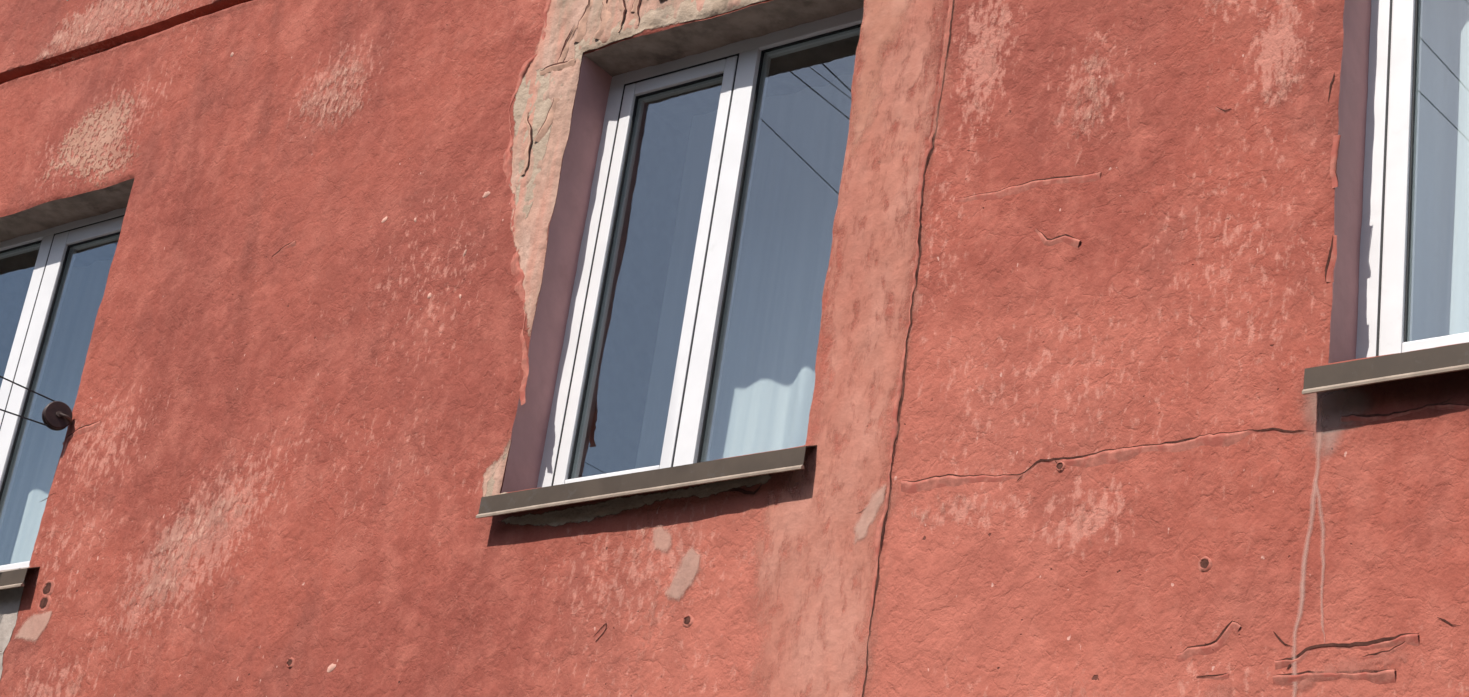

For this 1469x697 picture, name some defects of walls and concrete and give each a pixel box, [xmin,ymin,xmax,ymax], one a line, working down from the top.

peeling [38,0,179,61]
spalling [0,567,52,679]
peeling [482,439,511,497]
peeling [502,0,943,697]
crack [856,0,1469,697]
water stain [1293,407,1324,695]